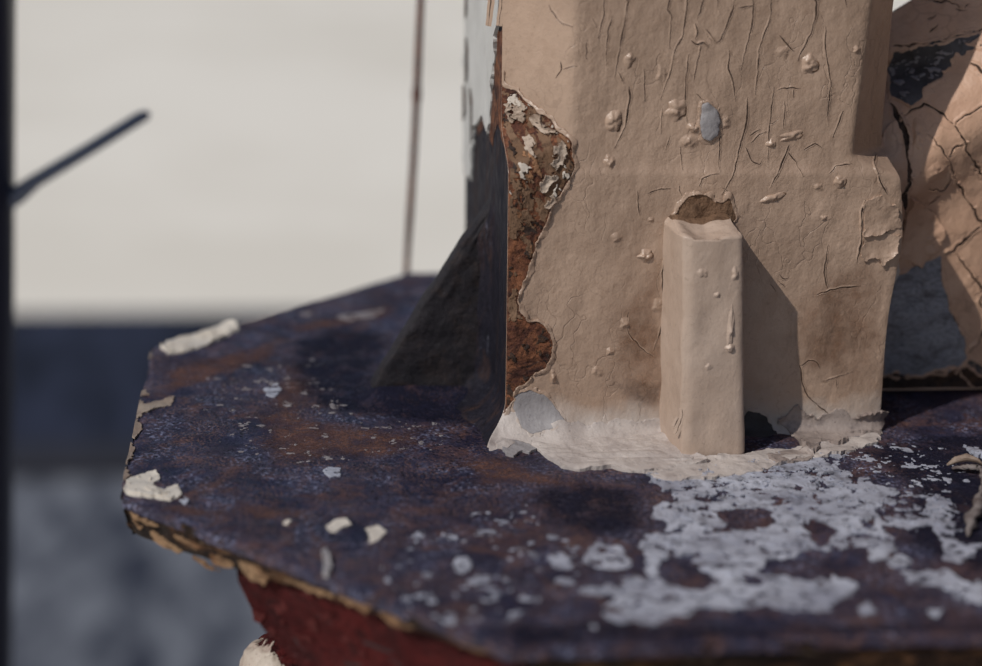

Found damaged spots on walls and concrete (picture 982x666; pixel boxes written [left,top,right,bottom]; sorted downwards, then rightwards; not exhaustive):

crack [548,0,982,312]
peeling [149,320,239,359]
peeling [380,27,982,627]
peeling [123,389,190,505]
peeling [239,638,285,666]